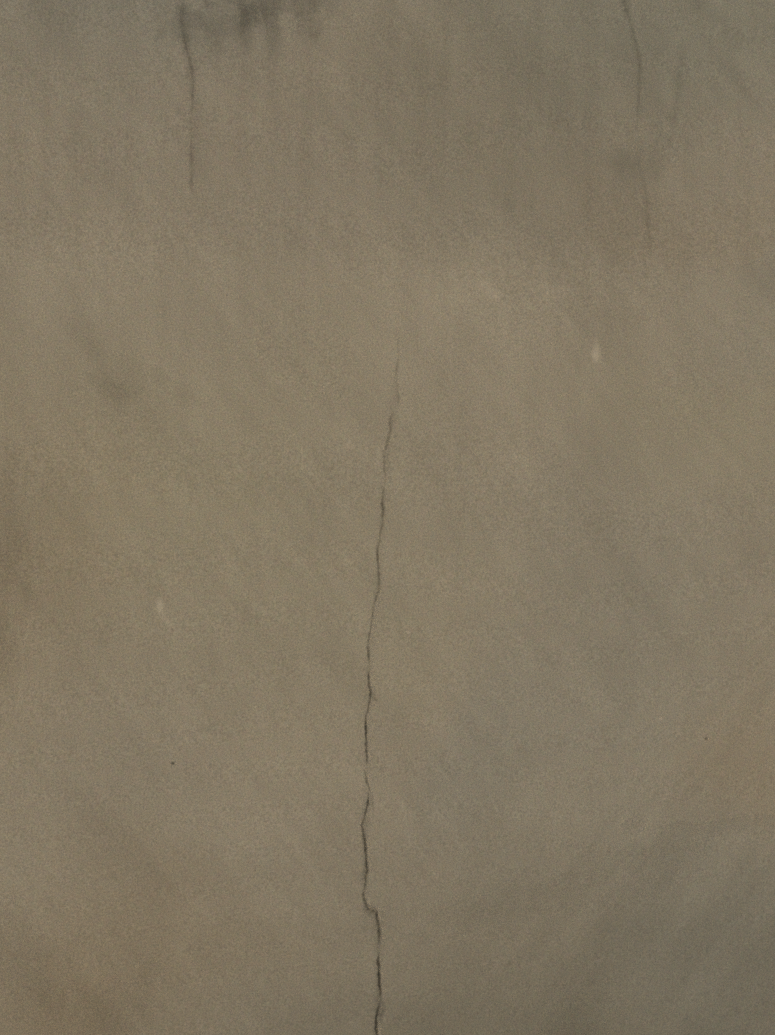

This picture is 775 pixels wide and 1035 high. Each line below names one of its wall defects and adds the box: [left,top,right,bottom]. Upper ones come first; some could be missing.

crack [361,799,369,875]
crack [374,961,382,1035]